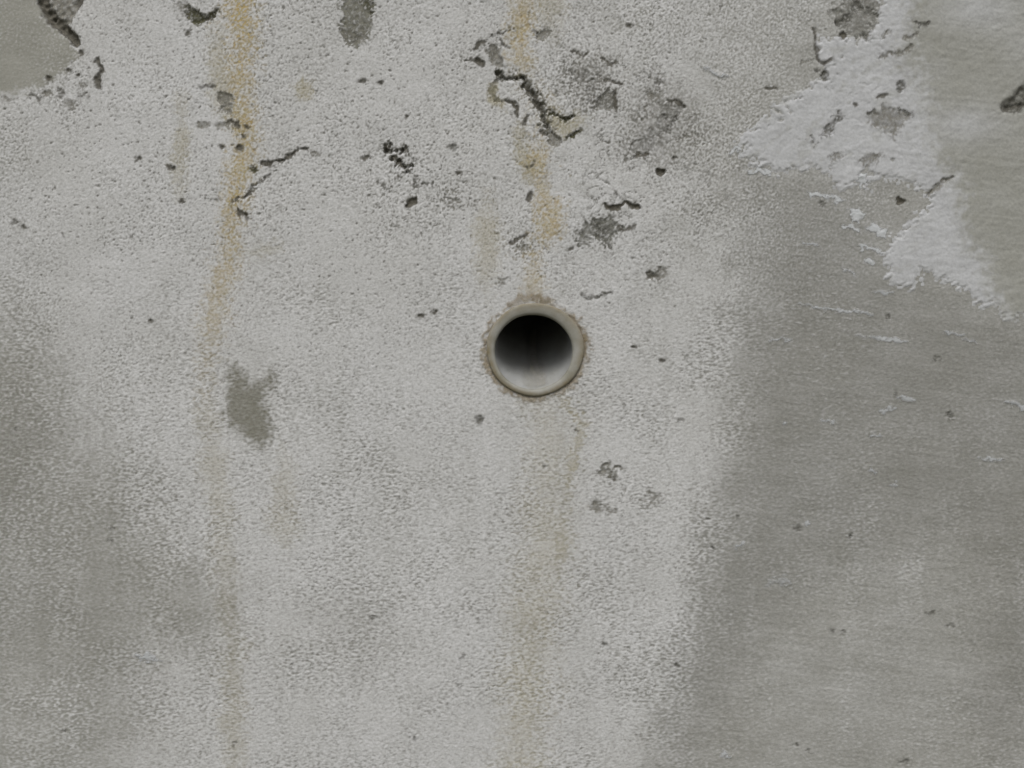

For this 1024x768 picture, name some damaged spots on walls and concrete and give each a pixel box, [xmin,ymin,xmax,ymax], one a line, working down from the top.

rust [225,0,258,233]
crack [493,70,582,146]
crack [215,148,318,219]
damp [228,371,271,441]